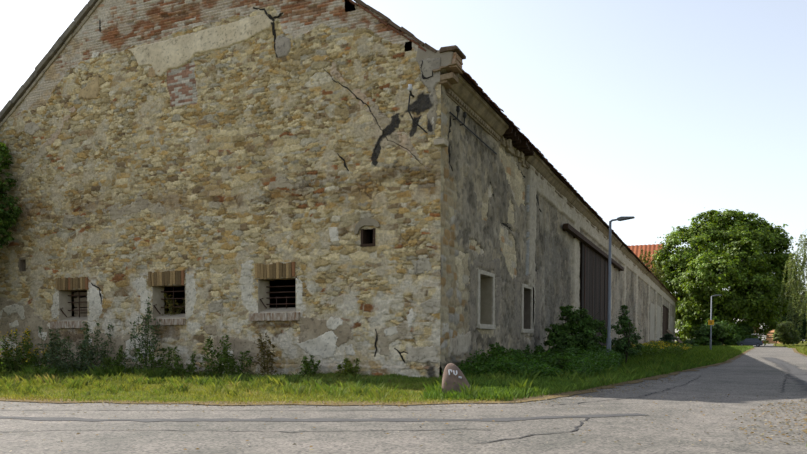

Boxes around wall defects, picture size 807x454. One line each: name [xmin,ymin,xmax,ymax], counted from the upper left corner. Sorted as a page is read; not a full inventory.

flaking render [498,136,526,280]
flaking render [455,240,484,291]
flaking render [296,278,304,305]
flaking render [297,316,356,359]
flaking render [374,308,494,364]